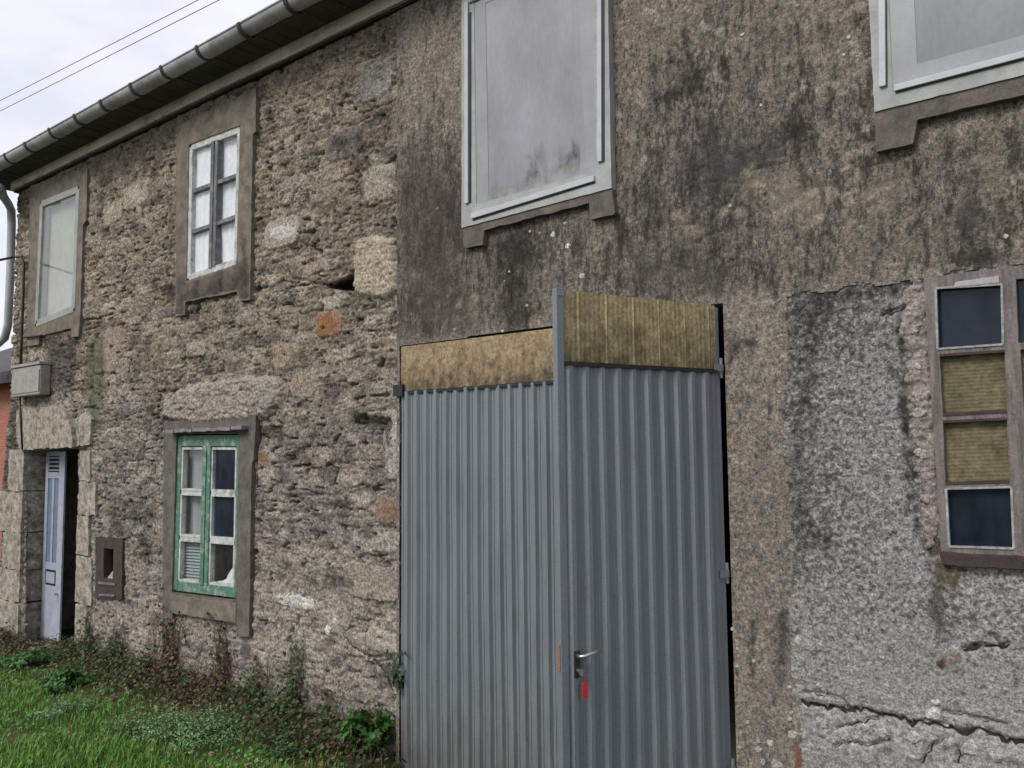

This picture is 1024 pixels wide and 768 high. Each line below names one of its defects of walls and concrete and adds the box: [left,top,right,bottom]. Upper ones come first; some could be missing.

flaking render [899,277,939,550]
crack [802,690,1024,763]